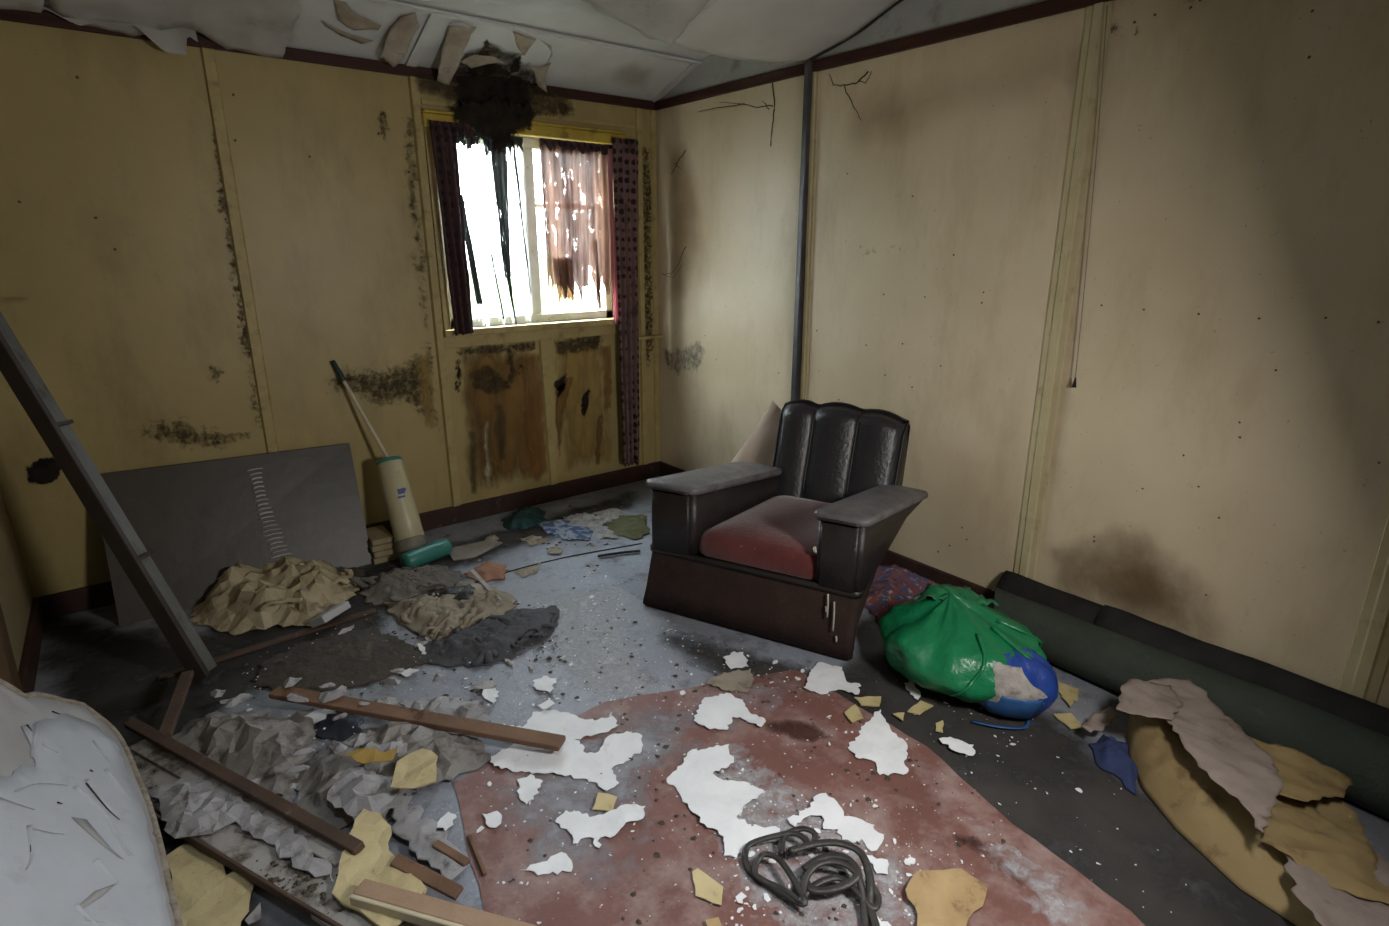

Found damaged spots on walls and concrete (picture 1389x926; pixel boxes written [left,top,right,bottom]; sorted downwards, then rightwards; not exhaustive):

crack [699,83,775,146]
crack [809,0,904,121]
damp [213,134,251,357]
spalling [26,457,61,484]
damp [155,422,243,446]
damp [334,347,432,423]
damp [455,336,611,489]
spalling [0,679,183,926]